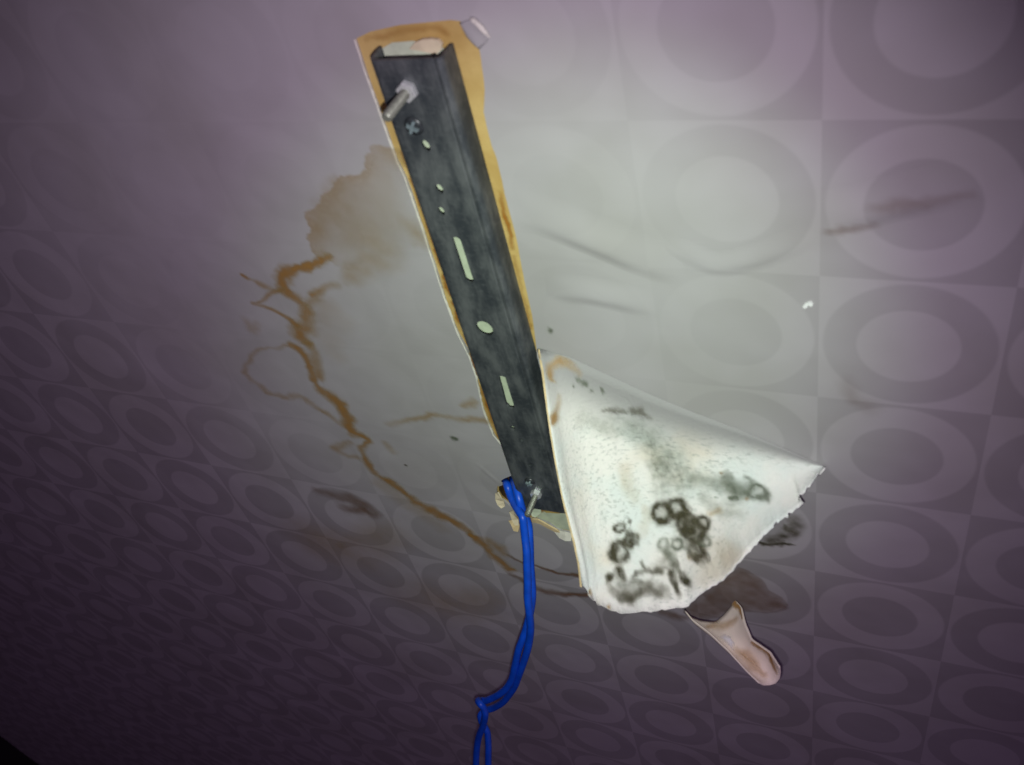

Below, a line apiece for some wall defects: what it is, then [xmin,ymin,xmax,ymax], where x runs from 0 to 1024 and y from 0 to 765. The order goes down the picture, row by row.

peeling [354,18,826,686]
damp [266,255,520,571]
damp [606,498,711,608]
damp [728,483,770,501]
damp [759,523,800,546]